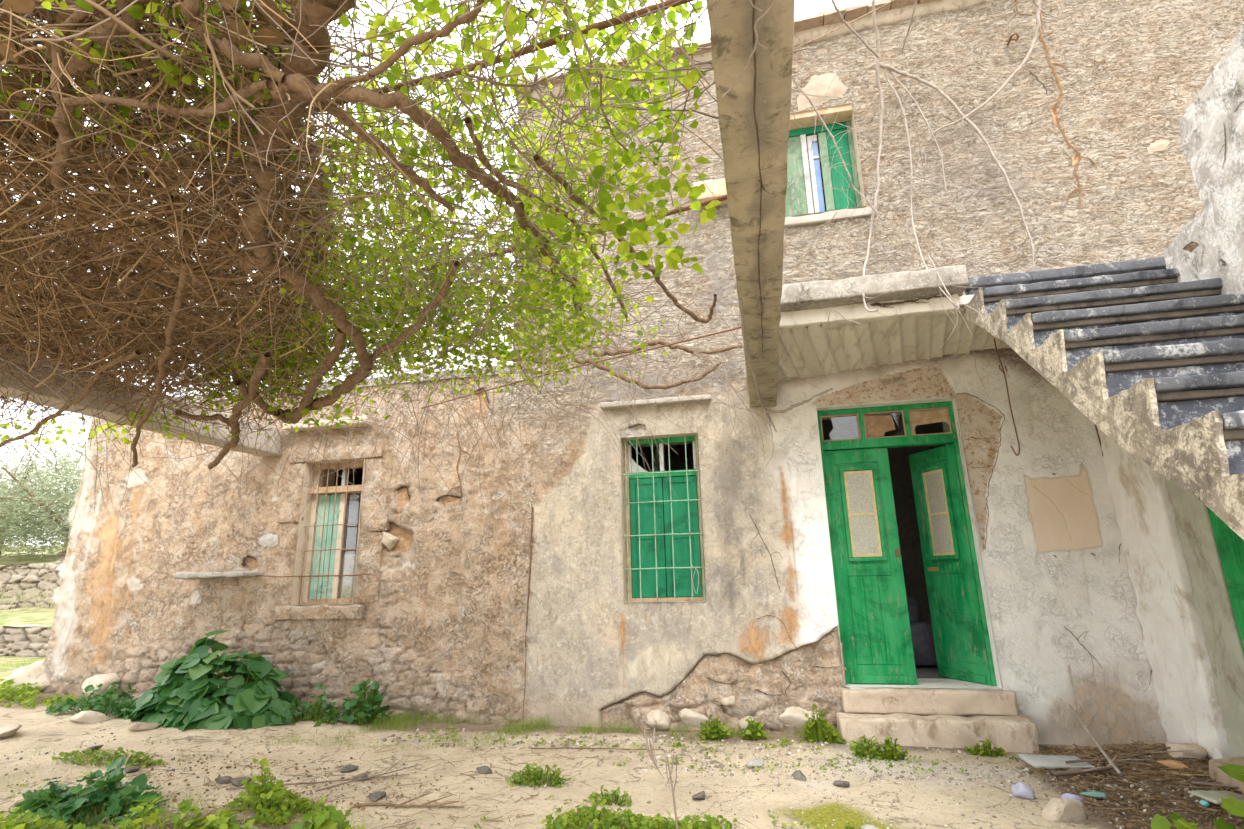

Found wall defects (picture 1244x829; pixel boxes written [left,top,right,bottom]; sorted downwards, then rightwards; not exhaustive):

crack [752,0,772,354]
crack [1008,0,1097,210]
crack [1216,86,1244,164]
flaking render [381,486,413,553]
flaking render [812,364,1005,551]
flaking render [601,627,846,733]